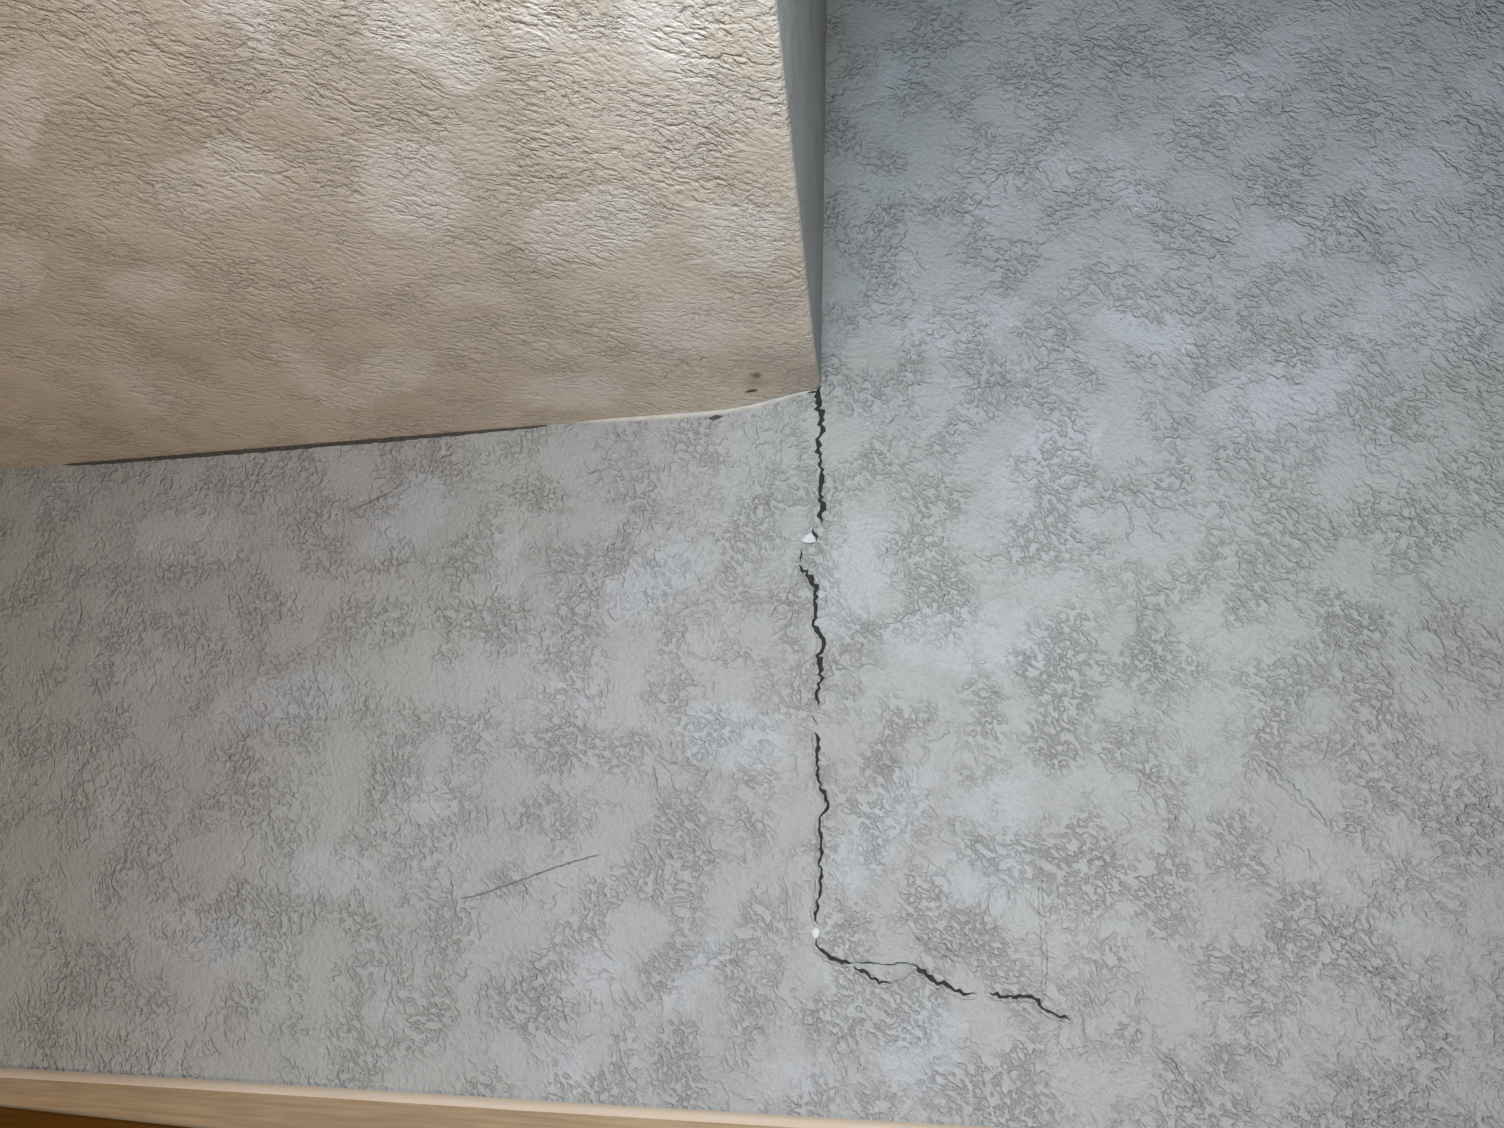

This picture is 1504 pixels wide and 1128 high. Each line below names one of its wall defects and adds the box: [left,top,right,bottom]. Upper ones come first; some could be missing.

crack [796,386,1072,1024]